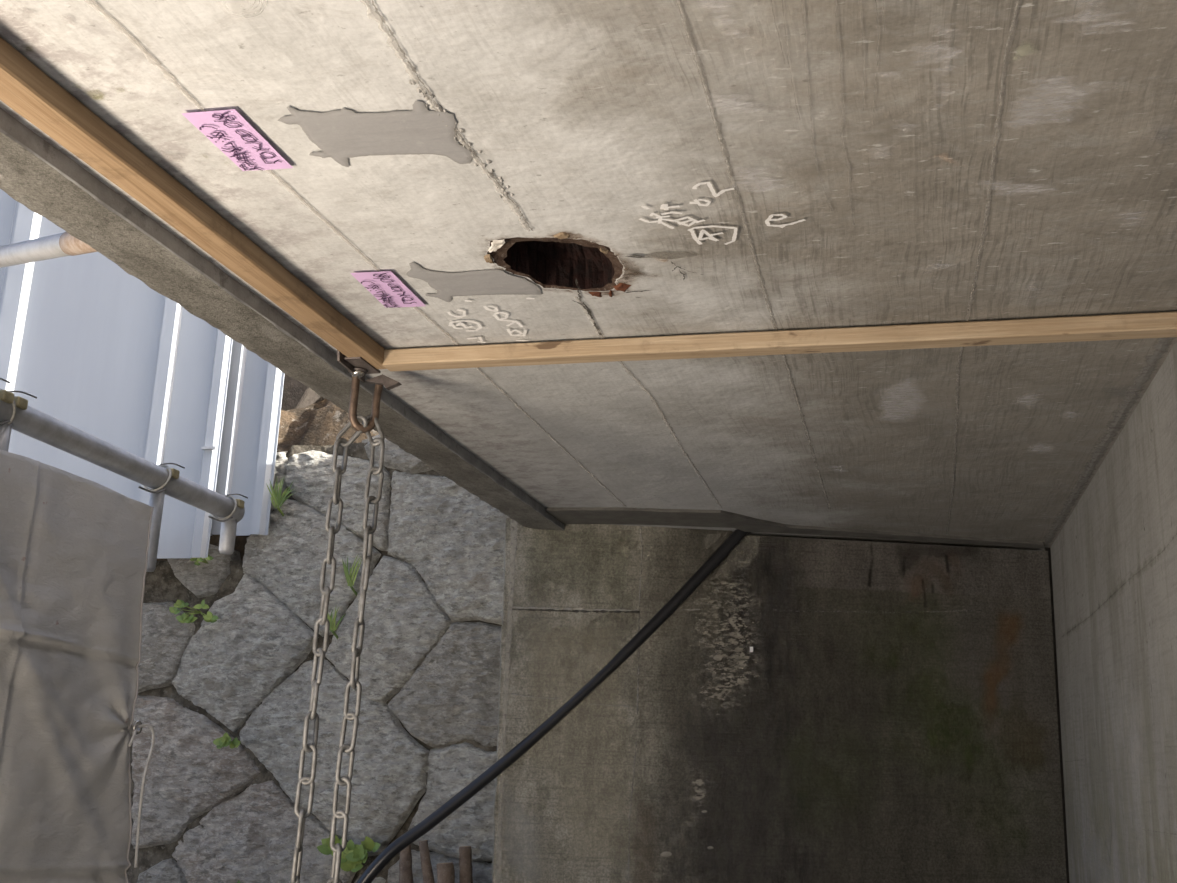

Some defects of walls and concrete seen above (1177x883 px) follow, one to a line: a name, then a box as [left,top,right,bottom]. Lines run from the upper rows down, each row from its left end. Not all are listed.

crack [372,0,533,231]
crack [574,279,602,335]
spalling [484,232,695,297]
water stain [694,556,789,753]